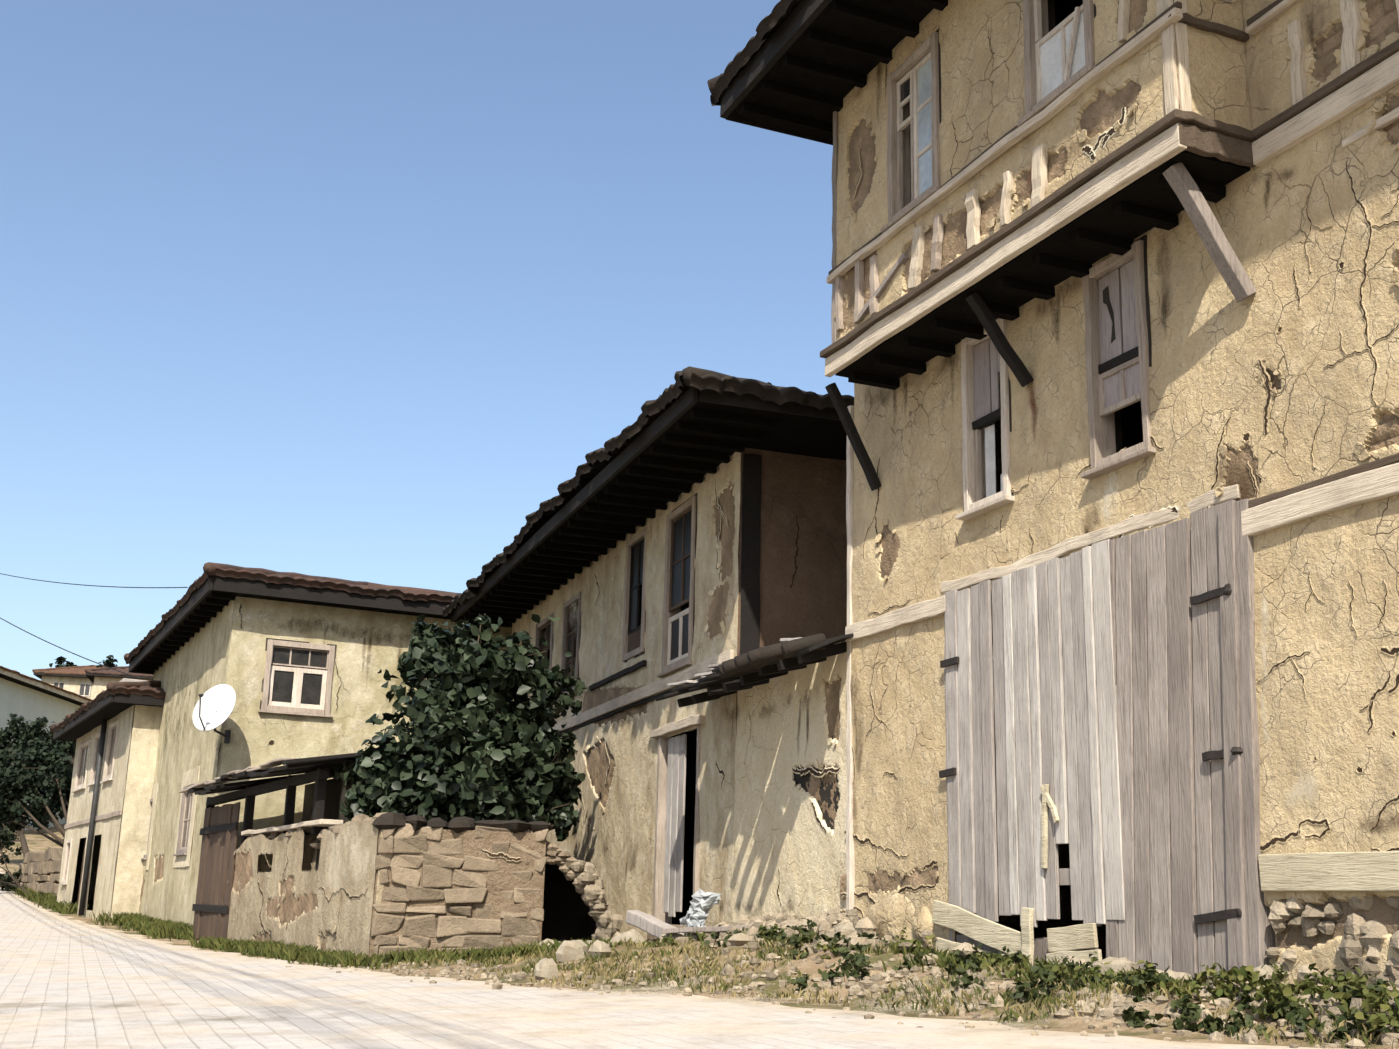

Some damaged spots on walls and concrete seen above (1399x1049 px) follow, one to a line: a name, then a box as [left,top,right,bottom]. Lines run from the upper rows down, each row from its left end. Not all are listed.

flaking render [904,80,1141,293]
crack [1292,160,1399,469]
crack [1210,358,1273,506]
flaking render [1354,413,1399,461]
flaking render [1215,444,1260,504]
flaking render [704,481,735,641]
flaking render [875,518,900,582]
crack [1257,650,1310,699]
crack [1305,572,1399,733]
flaking render [820,675,842,748]
crack [1260,817,1332,853]
crack [1370,792,1399,852]